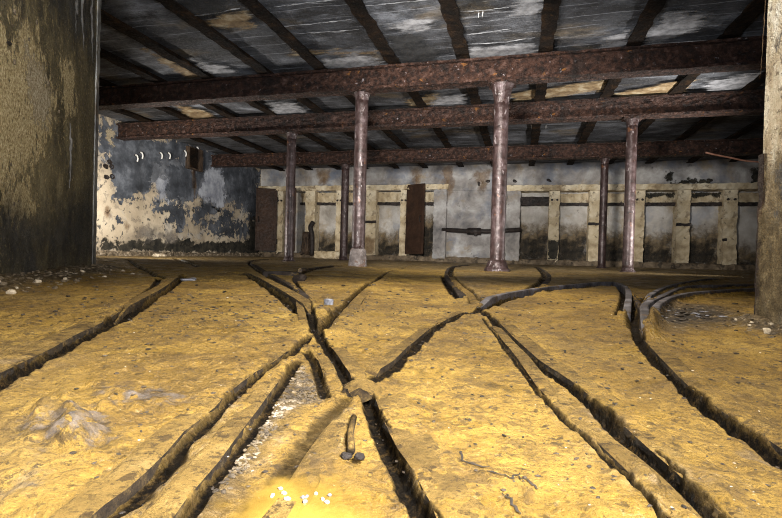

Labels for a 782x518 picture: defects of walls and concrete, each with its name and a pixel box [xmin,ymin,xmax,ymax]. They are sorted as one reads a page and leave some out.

damp [512,0,544,16]
damp [55,0,95,58]
damp [391,19,433,31]
rust [405,93,440,107]
rust [510,89,536,102]
rust [545,80,608,98]
peeling [98,115,261,242]
damp [6,198,259,273]
damp [519,222,587,261]
damp [606,231,623,261]
damp [643,233,672,263]
damp [688,228,718,264]